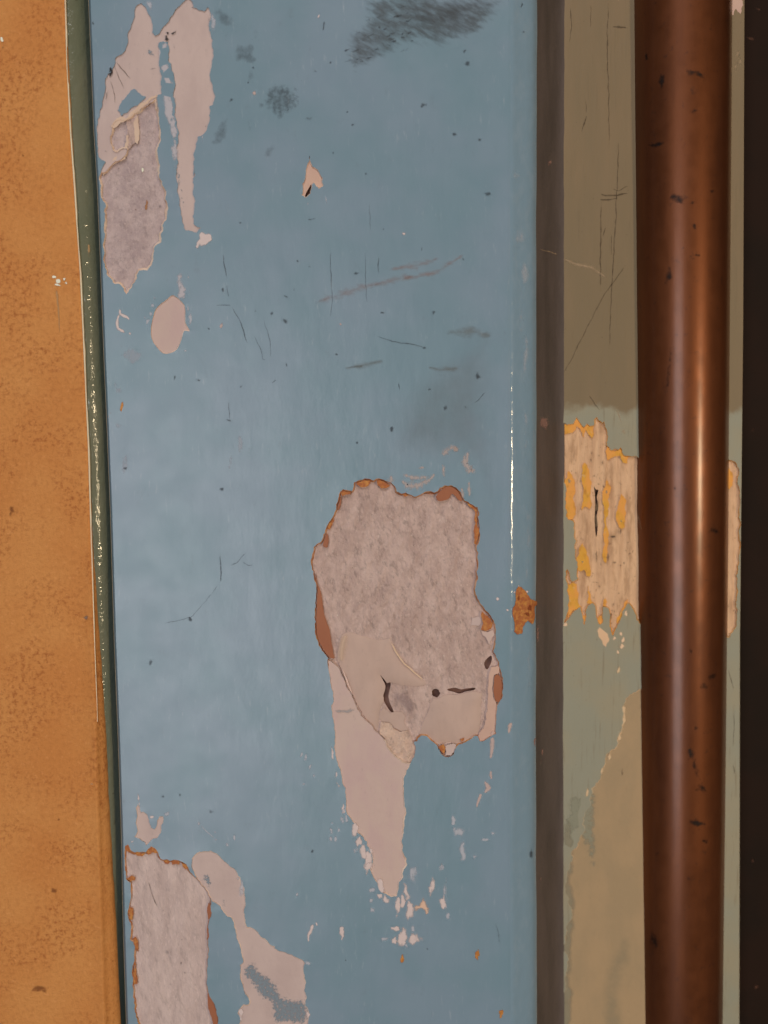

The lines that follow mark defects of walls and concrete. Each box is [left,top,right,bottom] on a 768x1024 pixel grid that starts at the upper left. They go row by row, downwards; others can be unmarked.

peeling [97,0,215,294]
peeling [302,156,323,197]
peeling [146,276,192,354]
peeling [563,417,640,654]
peeling [727,460,741,638]
peeling [311,478,503,963]
peeling [124,796,310,1024]
peeling [564,689,645,1024]